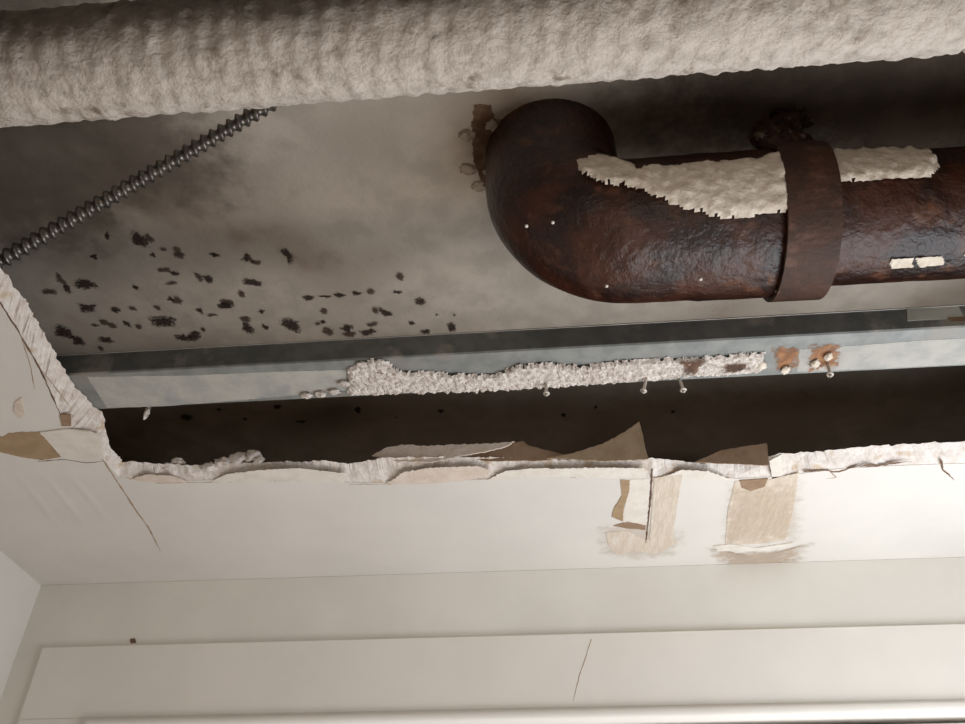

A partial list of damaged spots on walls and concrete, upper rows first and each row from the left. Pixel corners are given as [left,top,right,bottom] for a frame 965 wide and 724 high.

spalling [458,104,500,192]
leakage [132,232,184,259]
leakage [79,268,205,351]
leakage [196,278,262,317]
leakage [302,289,393,337]
crack [0,302,72,414]
peeling [300,380,351,399]
peeling [356,359,387,368]
corrosion [680,360,706,375]
corrosion [724,344,840,375]
peeling [0,414,105,461]
crack [38,459,161,552]